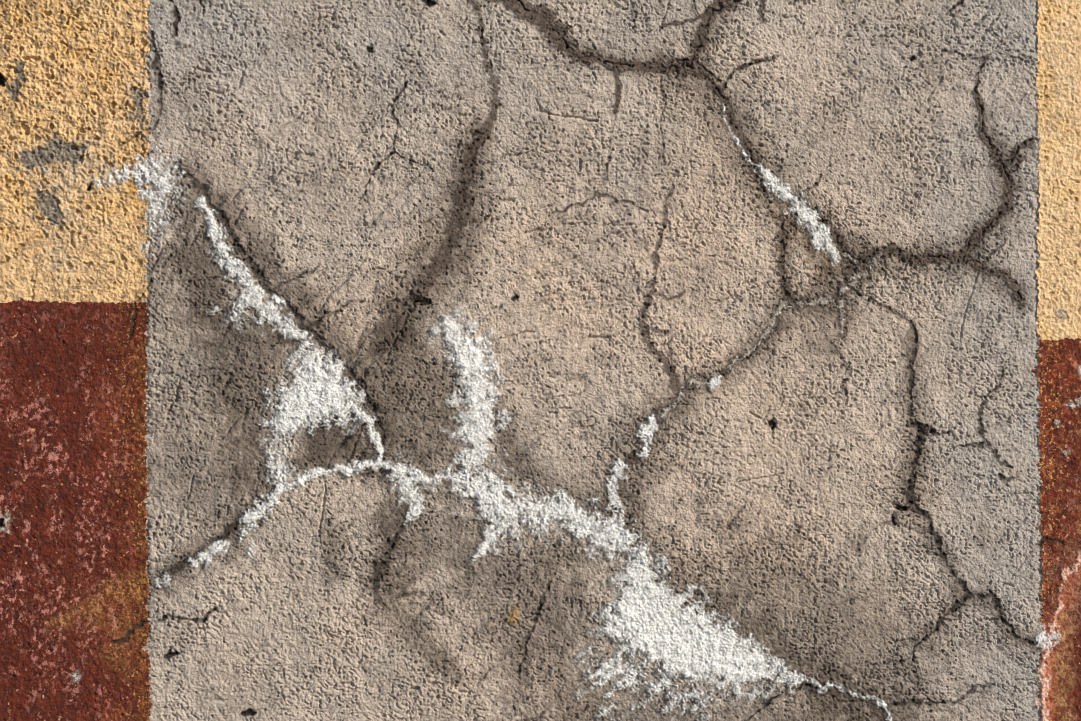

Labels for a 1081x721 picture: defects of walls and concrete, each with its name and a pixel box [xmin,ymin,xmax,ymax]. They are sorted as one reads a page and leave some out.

peeling [0,60,26,98]
crack [121,0,205,146]
peeling [19,132,85,169]
crack [365,81,432,203]
peeling [34,189,68,231]
crack [174,162,385,462]
crack [403,0,1040,673]
leakage [95,106,892,721]
crack [154,493,271,584]
crack [372,520,425,611]
crack [112,607,217,643]
crack [748,677,992,721]